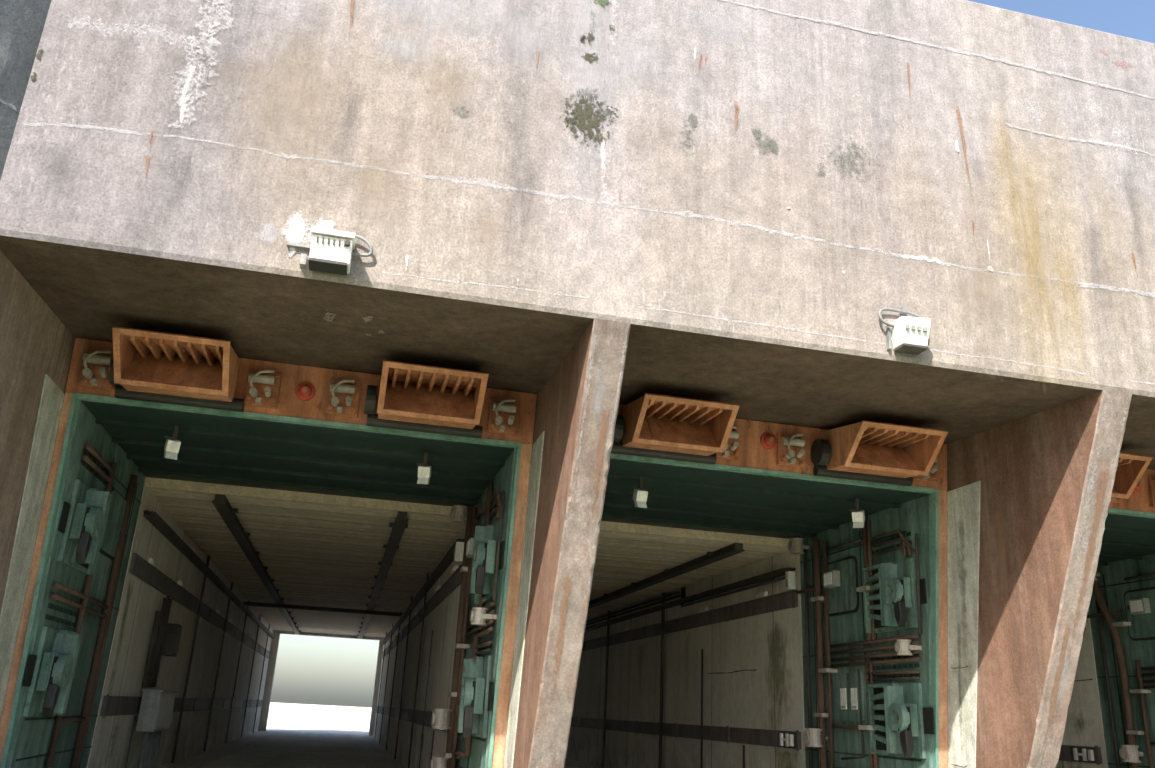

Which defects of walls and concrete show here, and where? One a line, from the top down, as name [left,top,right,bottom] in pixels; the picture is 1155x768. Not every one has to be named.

crack [721,0,1153,99]
crack [26,65,1155,298]
corrosion [956,110,969,176]
damp [262,213,335,256]